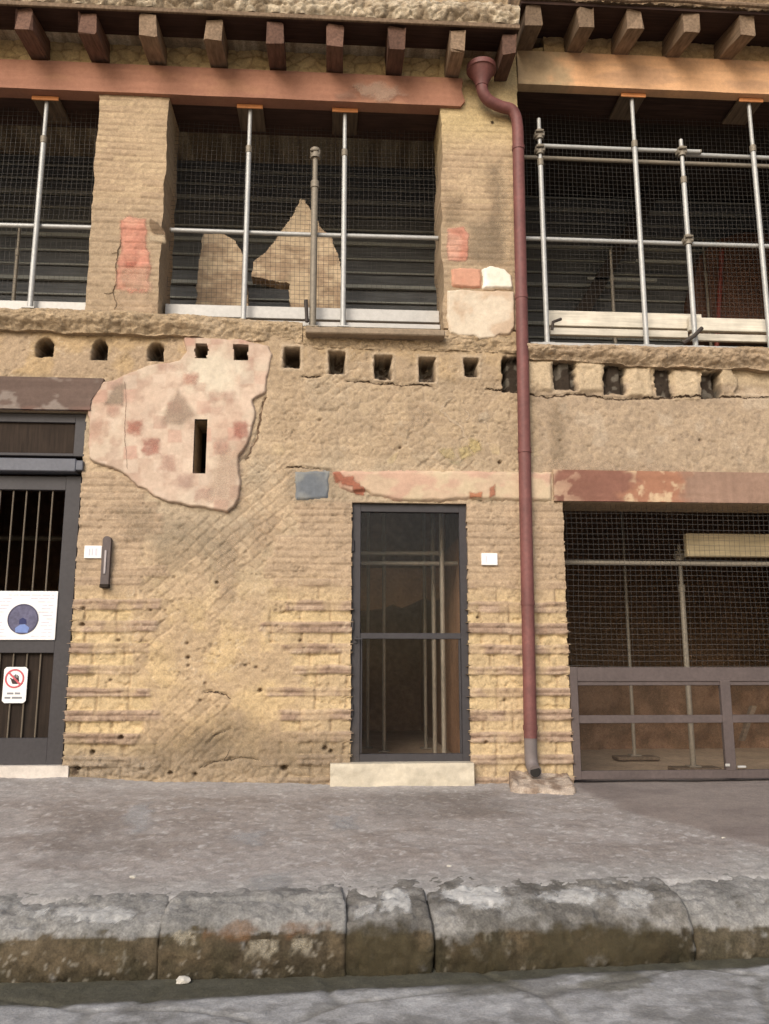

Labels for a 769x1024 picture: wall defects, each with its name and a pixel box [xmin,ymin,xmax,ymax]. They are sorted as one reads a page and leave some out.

crack [104,240,121,308]
crack [347,380,432,388]
crack [486,388,769,401]
flaking render [88,337,273,513]
peeling [333,472,365,495]